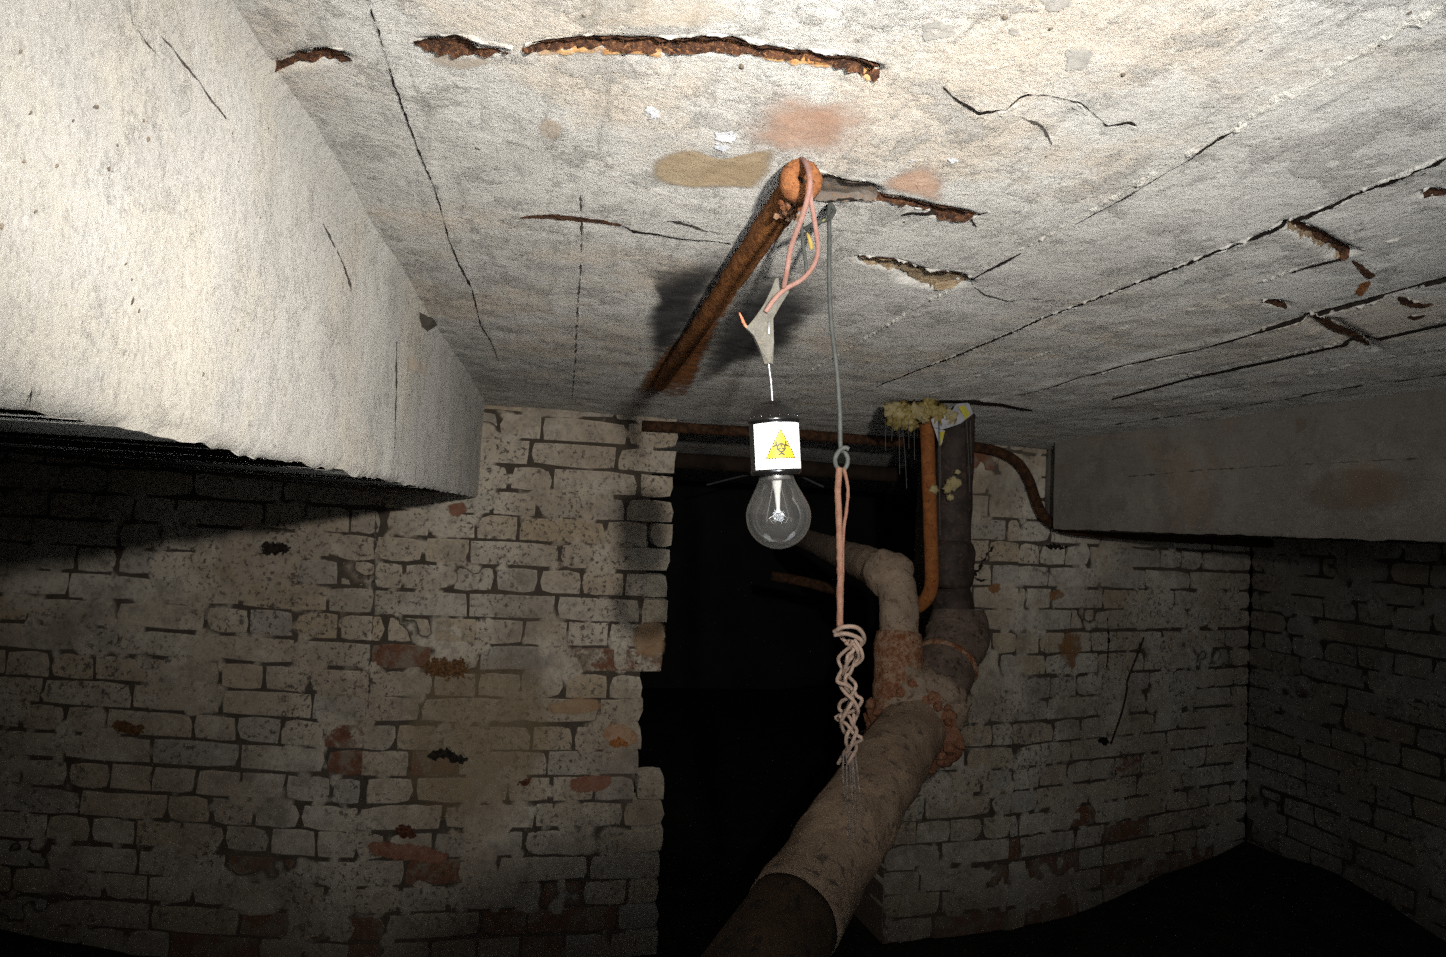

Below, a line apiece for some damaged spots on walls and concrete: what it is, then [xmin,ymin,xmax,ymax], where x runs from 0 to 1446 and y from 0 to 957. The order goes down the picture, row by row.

crack [130,2,227,119]
spalling [275,47,352,72]
rust [764,103,855,147]
crack [943,87,1137,147]
crack [369,3,882,358]
damp [655,151,771,187]
spalling [814,170,988,228]
crack [1075,128,1247,225]
crack [521,196,730,396]
spalling [857,254,1033,302]
crack [876,156,1446,425]